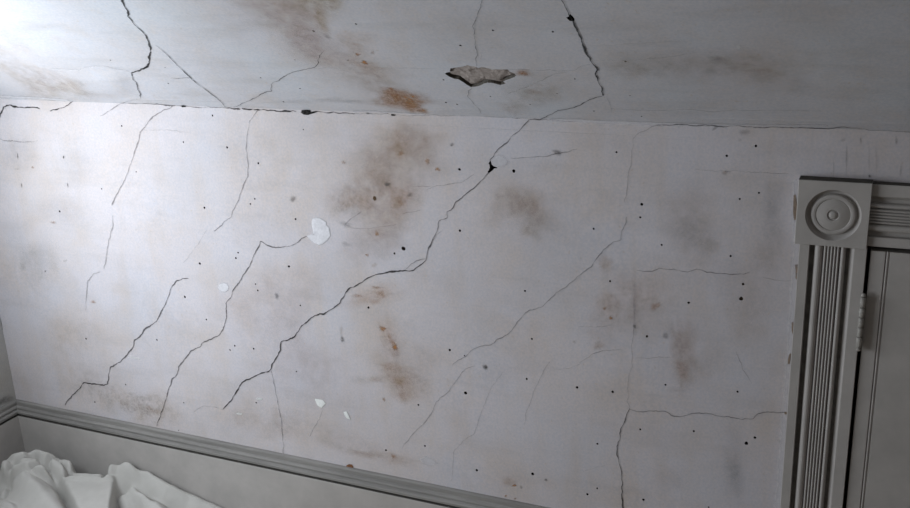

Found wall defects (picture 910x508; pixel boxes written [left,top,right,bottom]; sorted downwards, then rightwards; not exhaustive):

crack [121,0,388,114]
flaking render [445,65,516,87]
crack [658,122,785,130]
crack [223,0,604,410]
crack [65,278,188,405]
crack [157,236,307,423]
crack [616,408,634,508]